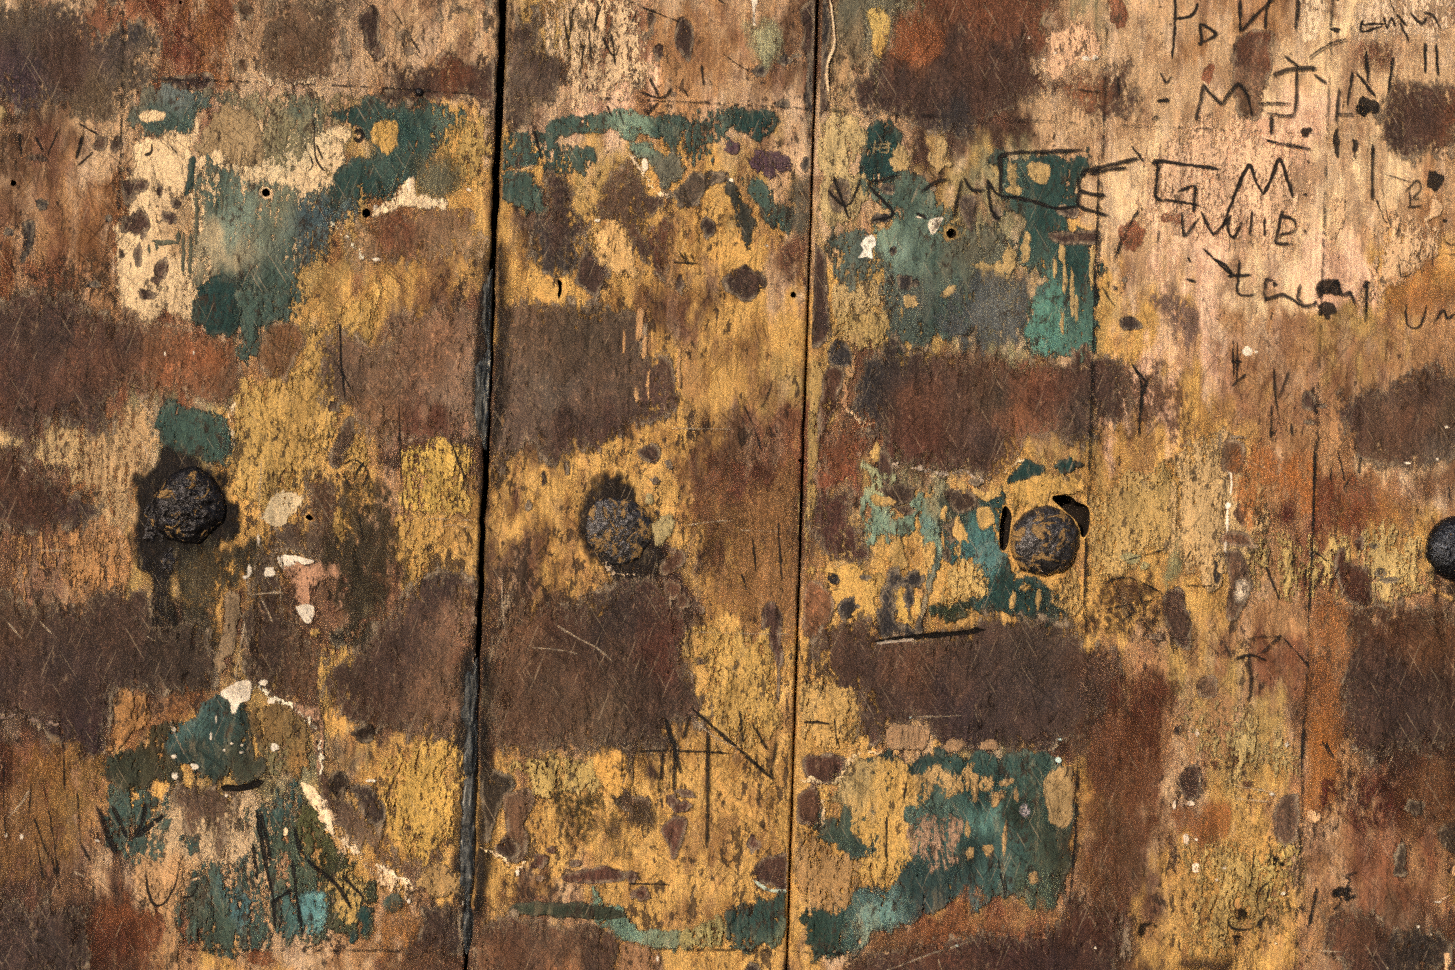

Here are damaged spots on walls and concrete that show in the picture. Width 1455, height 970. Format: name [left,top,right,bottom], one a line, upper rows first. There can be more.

peeling [0,0,214,153]
peeling [233,0,598,169]
peeling [639,9,694,62]
peeling [849,0,1144,195]
peeling [721,264,767,302]
corrosion [128,445,240,641]
peeling [0,139,740,902]
corrosion [578,472,663,583]
corrosion [675,451,774,574]
peeling [796,204,1144,861]
peeling [761,601,784,702]
peeling [746,834,788,893]